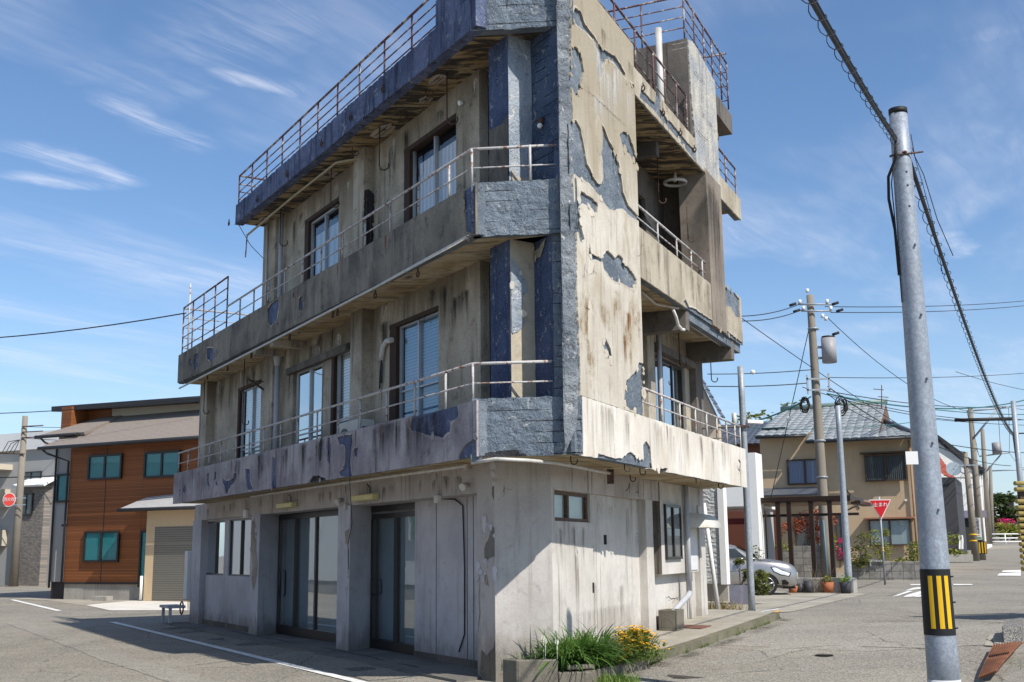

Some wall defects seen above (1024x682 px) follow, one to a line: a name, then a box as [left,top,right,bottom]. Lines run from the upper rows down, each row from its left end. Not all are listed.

peeling [569,45,584,96]
peeling [573,8,694,159]
peeling [568,119,660,292]
peeling [510,258,528,333]
peeling [623,363,646,417]
peeling [411,407,459,441]
peeling [207,469,253,494]
peeling [317,432,358,476]
spalling [598,442,666,474]
peeling [475,514,497,587]